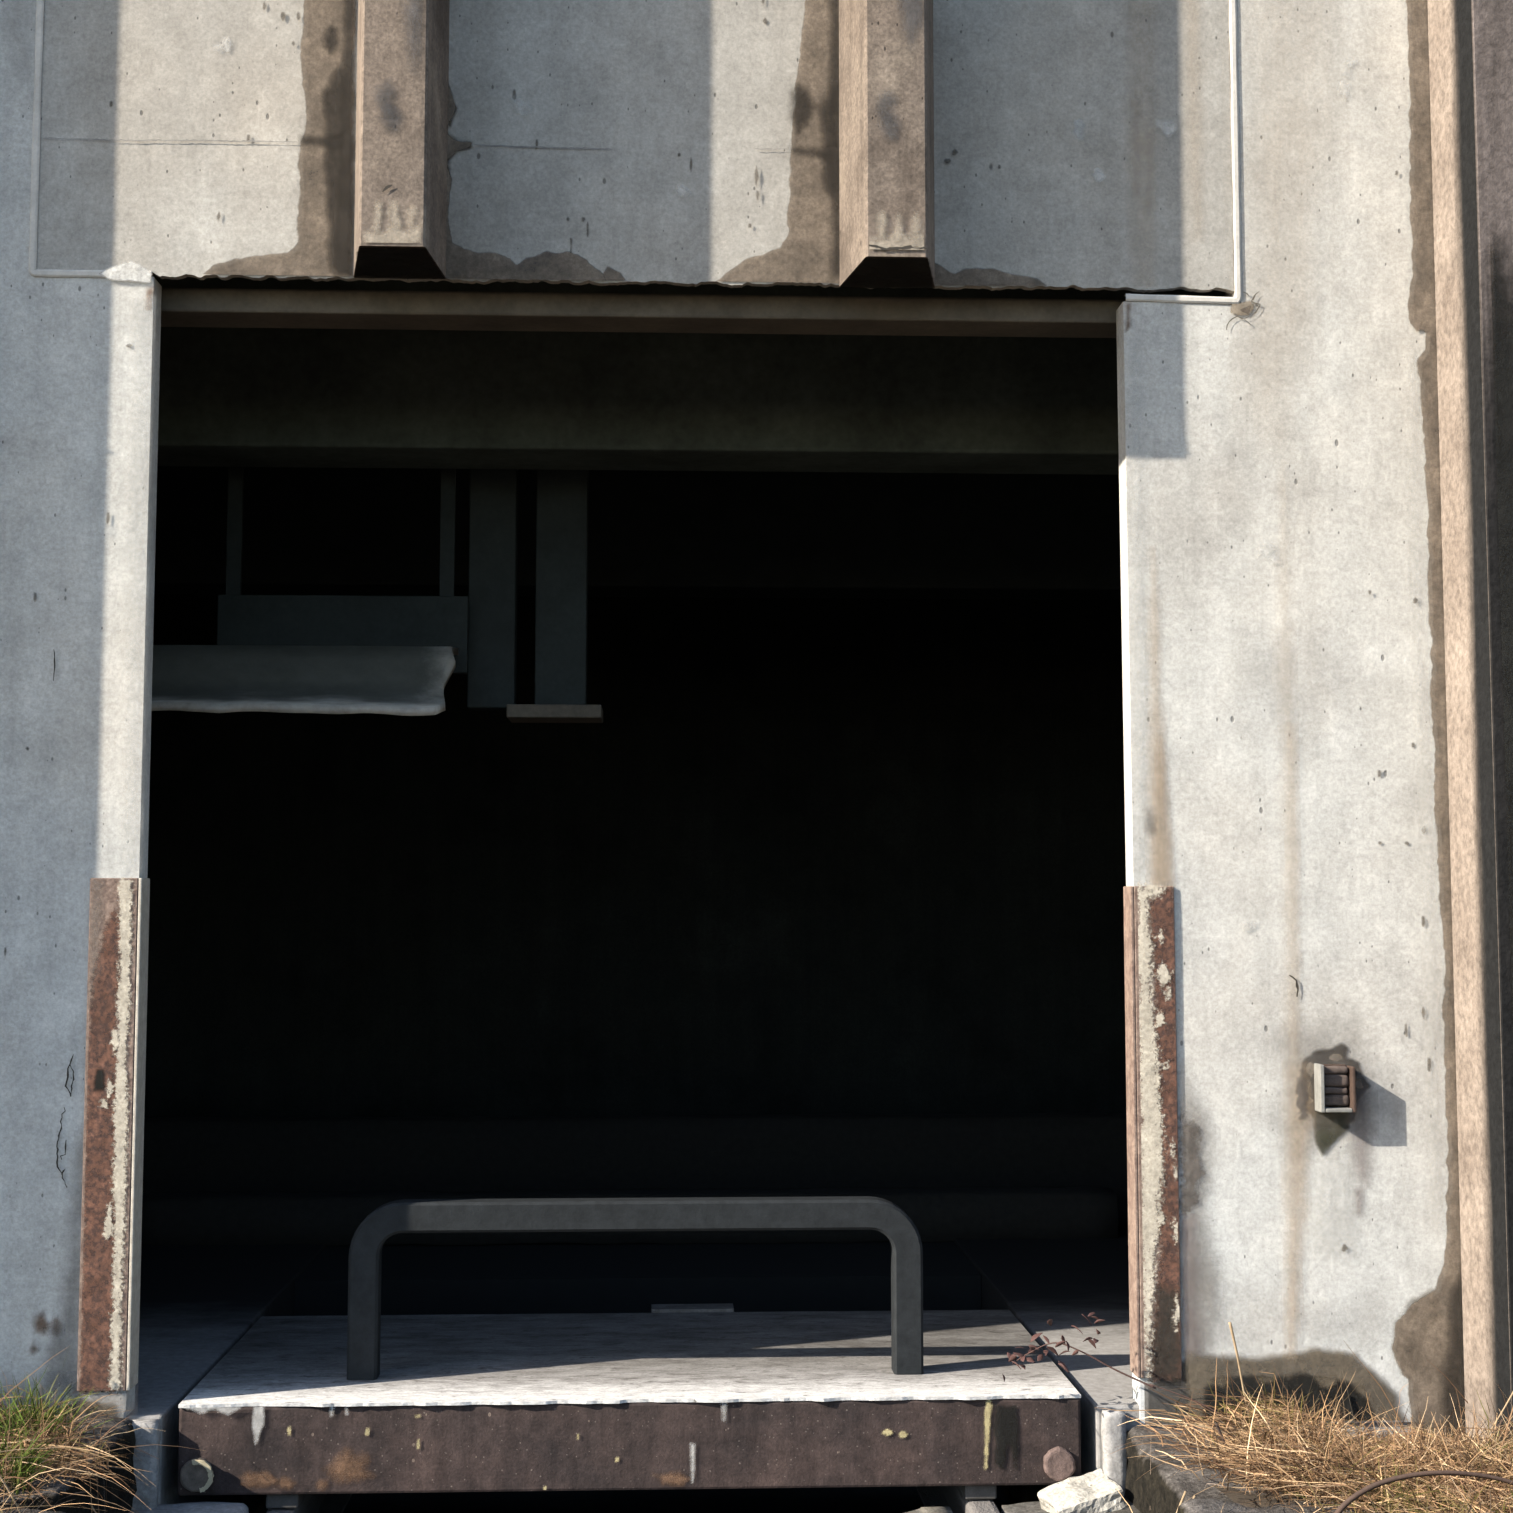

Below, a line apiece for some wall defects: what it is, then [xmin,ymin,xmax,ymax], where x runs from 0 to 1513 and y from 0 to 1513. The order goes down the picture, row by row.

water stain [204,0,420,276]
water stain [445,83,626,281]
water stain [717,0,840,283]
water stain [869,214,1046,286]
water stain [1144,0,1466,1443]
crack [56,1054,75,1187]
rust [79,908,121,1394]
rust [1147,887,1181,1382]
rust [32,1315,59,1351]
rust [244,1473,291,1487]
rust [318,1452,366,1488]
rust [661,1474,686,1484]